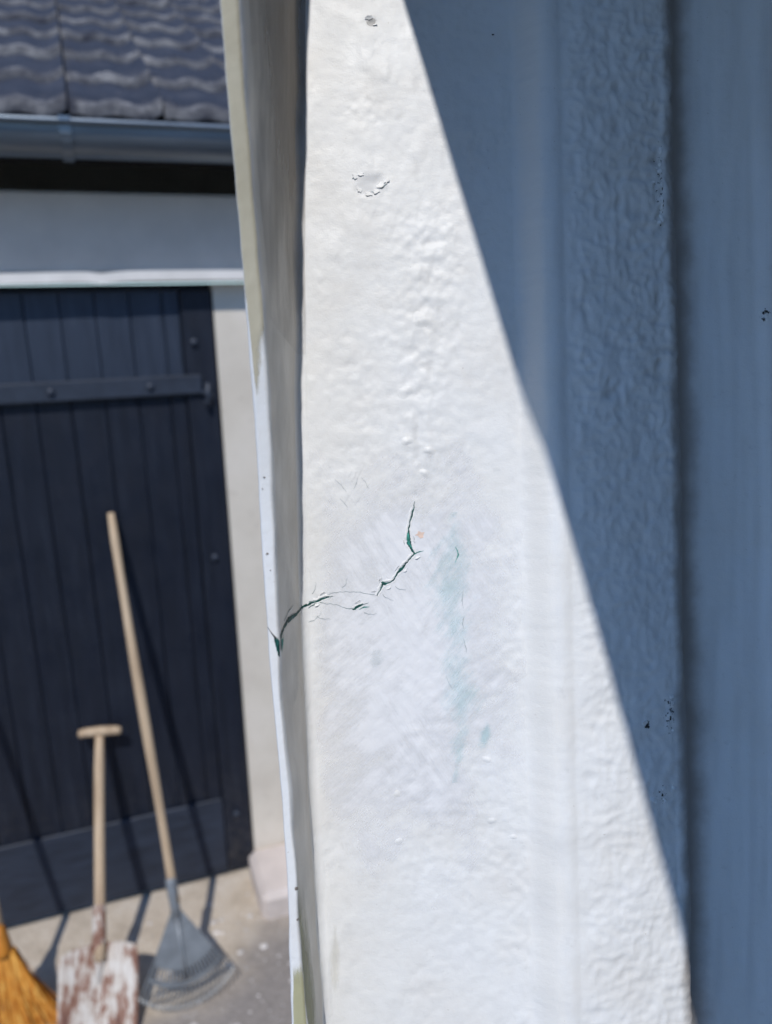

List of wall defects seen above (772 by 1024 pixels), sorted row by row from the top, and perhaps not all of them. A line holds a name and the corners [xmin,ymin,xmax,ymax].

crack [268,502,424,656]